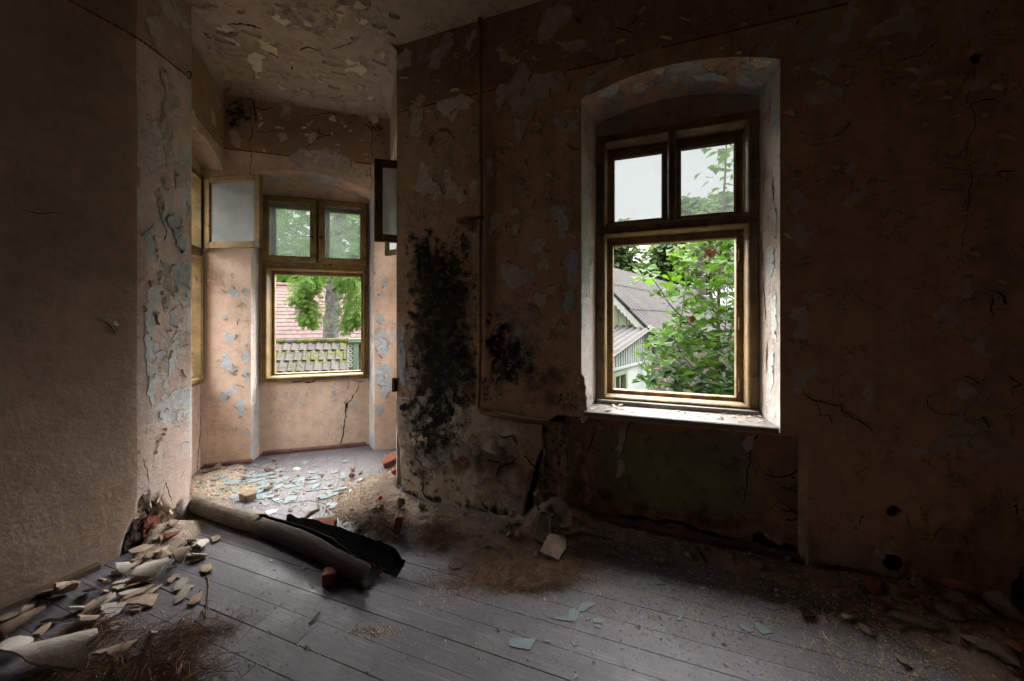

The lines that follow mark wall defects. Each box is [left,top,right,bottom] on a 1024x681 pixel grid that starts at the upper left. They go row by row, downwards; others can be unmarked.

peeling [211,23,279,72]
peeling [265,0,371,37]
peeling [437,94,475,122]
peeling [582,187,590,223]
peeling [141,187,193,411]
peeling [581,239,594,329]
peeling [217,316,251,435]
peeling [374,314,406,417]
damp [400,227,579,497]
crack [340,380,364,444]
crack [487,433,535,477]
spalling [122,489,186,555]